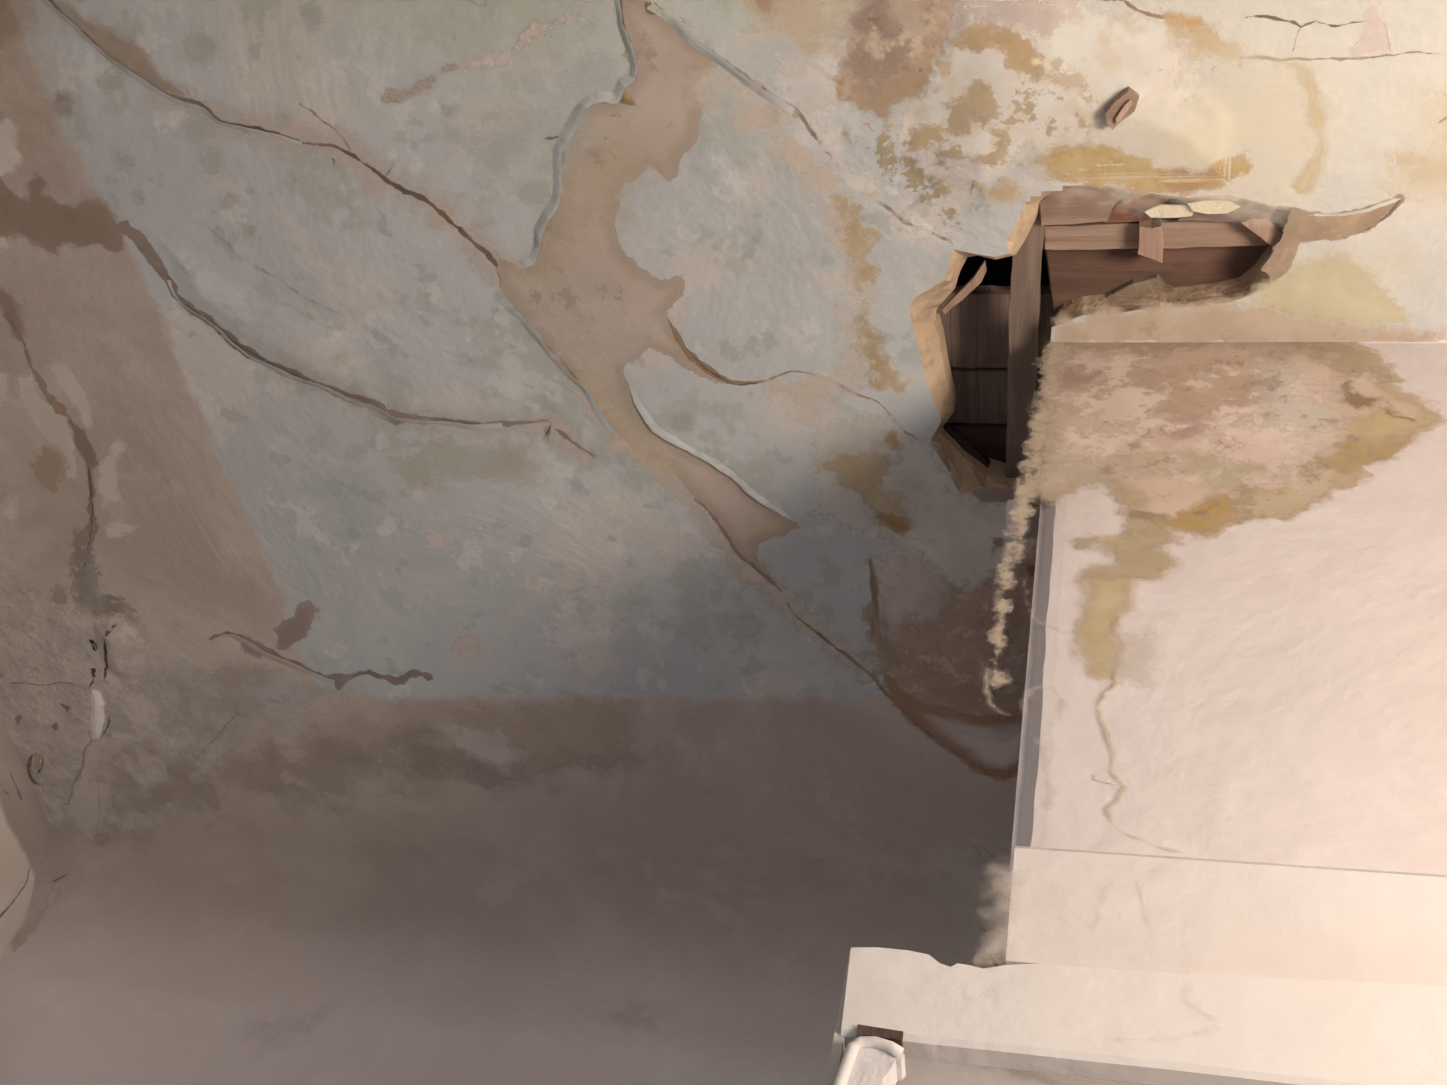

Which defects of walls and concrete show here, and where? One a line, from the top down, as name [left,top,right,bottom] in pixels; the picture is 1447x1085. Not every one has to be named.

damp [0,0,123,253]
crack [0,311,135,597]
crack [43,0,501,286]
crack [118,220,594,457]
peeling [496,0,1068,717]
damp [744,0,852,53]
damp [844,65,1325,230]
peeling [1144,200,1240,218]
damp [1031,258,1444,751]
crack [1103,0,1433,68]
flaking render [1262,194,1405,281]
crack [209,631,433,690]